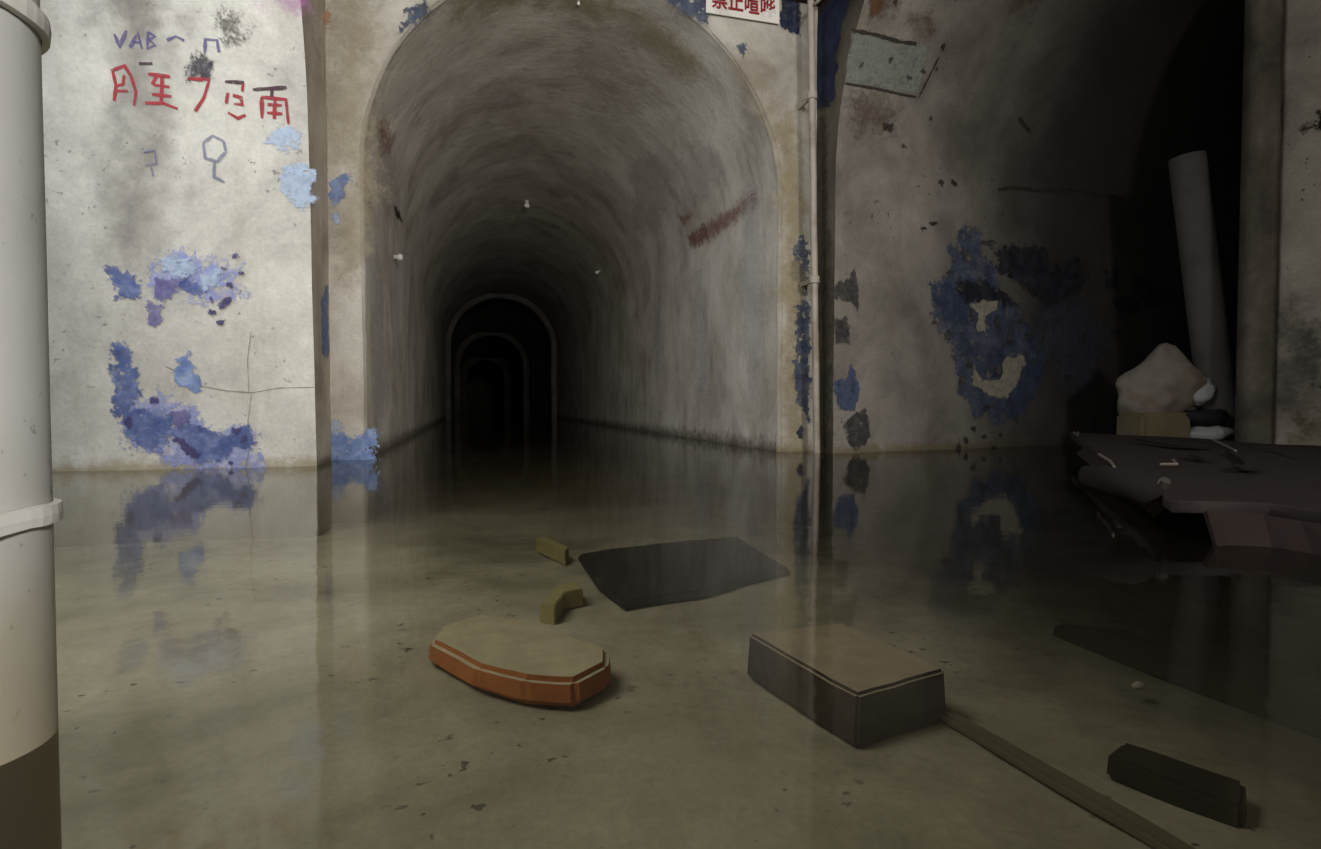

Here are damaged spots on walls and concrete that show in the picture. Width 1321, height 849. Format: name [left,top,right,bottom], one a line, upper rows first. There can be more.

peeling [399,0,432,33]
peeling [668,0,709,26]
peeling [263,126,353,224]
rust [680,193,755,249]
peeling [104,246,250,328]
peeling [790,235,812,439]
peeling [833,269,859,345]
peeling [927,224,1110,449]
peeling [108,342,265,469]
peeling [316,420,383,460]
peeling [832,364,870,450]